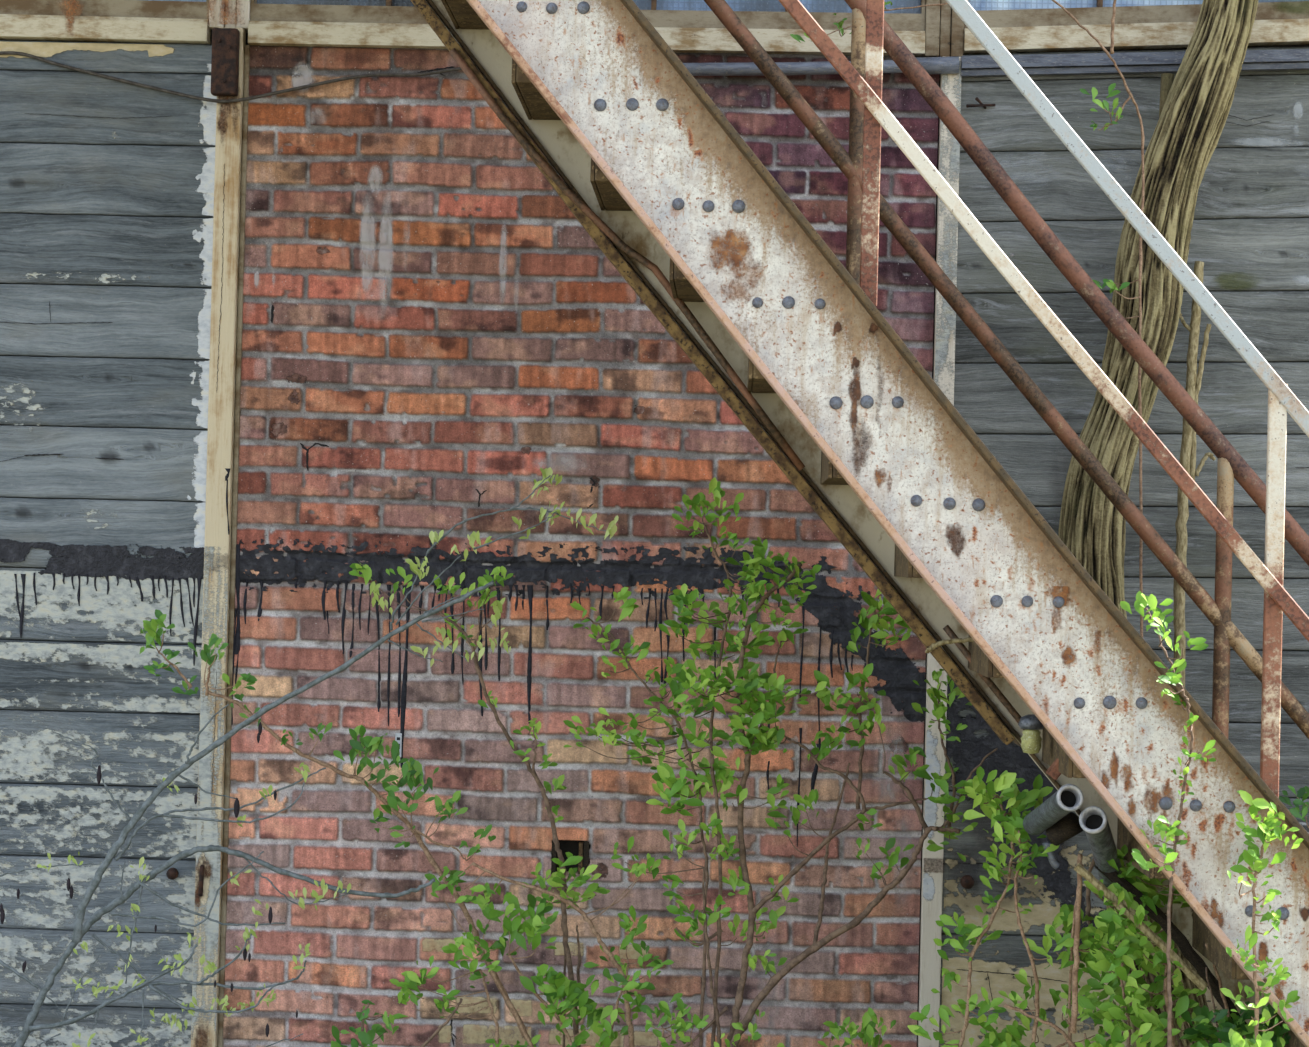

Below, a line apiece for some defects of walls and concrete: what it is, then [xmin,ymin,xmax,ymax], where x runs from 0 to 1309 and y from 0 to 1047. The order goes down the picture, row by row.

rust [712,230,762,300]
rust [849,357,891,490]
peeling [0,64,228,1047]
rust [946,525,965,557]
rust [1050,586,1070,632]
rust [1062,646,1076,665]
rust [1102,751,1174,833]
rust [1211,898,1224,927]
rust [1259,942,1283,999]